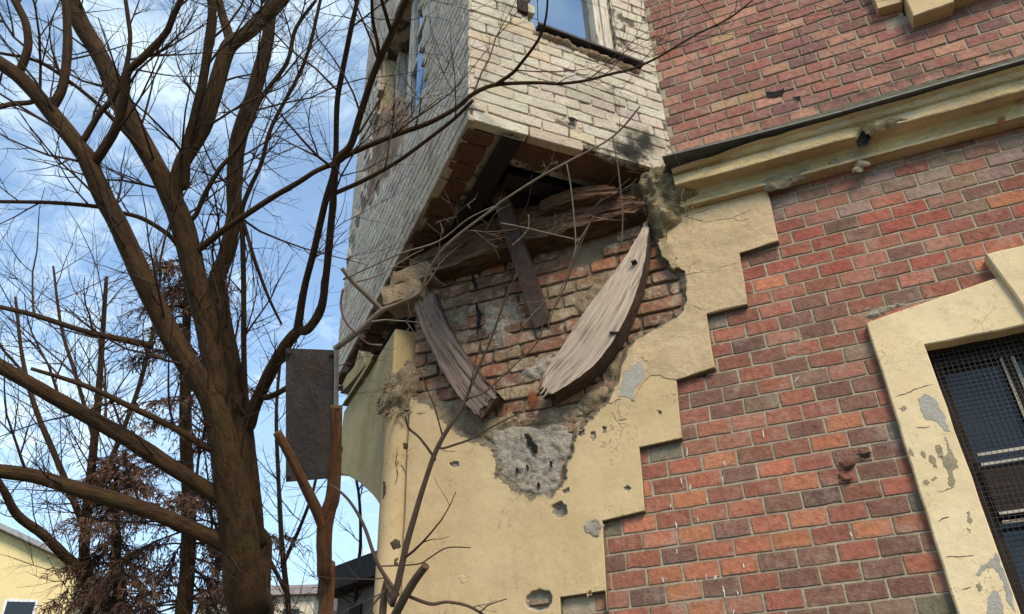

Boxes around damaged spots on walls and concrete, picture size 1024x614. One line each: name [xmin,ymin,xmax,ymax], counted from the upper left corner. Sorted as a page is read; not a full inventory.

spalling [766,88,800,100]
flaking render [411,168,808,518]
peeling [909,393,959,488]
spalling [837,449,872,483]
spalling [583,519,604,538]
spalling [526,589,552,611]
peeling [976,553,1016,614]